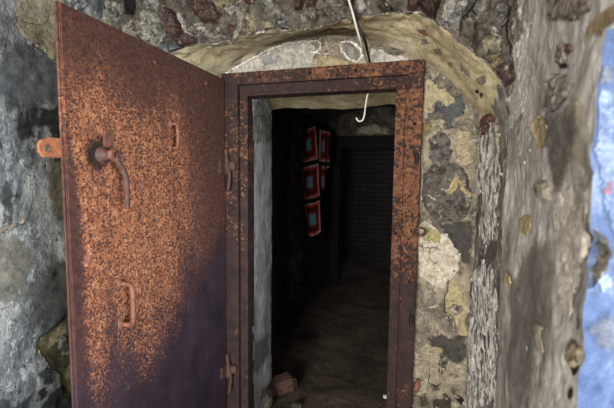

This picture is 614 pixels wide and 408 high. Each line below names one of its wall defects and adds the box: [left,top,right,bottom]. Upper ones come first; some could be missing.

spalling [104,0,548,408]